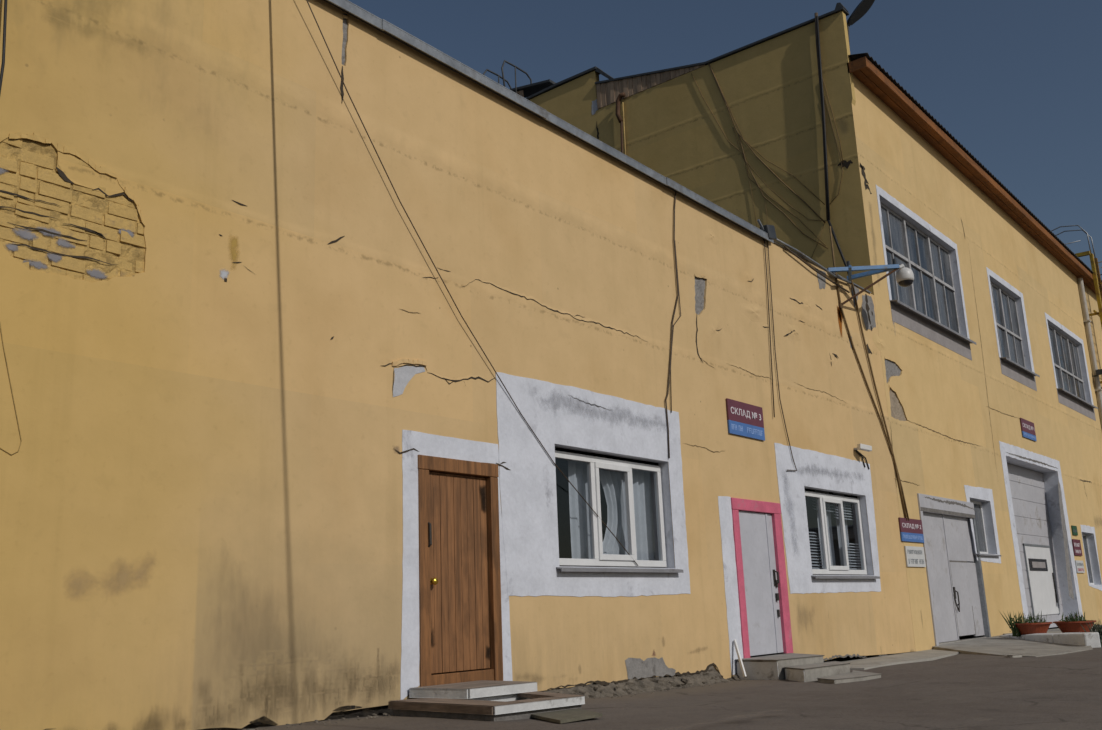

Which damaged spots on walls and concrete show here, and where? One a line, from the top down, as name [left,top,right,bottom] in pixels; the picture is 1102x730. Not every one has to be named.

spalling [0,132,146,283]
crack [422,268,647,342]
spalling [694,273,707,362]
flaking render [380,359,428,397]
spalling [884,356,906,421]
spalling [541,653,740,699]
crack [199,717,277,730]
crack [310,705,393,722]